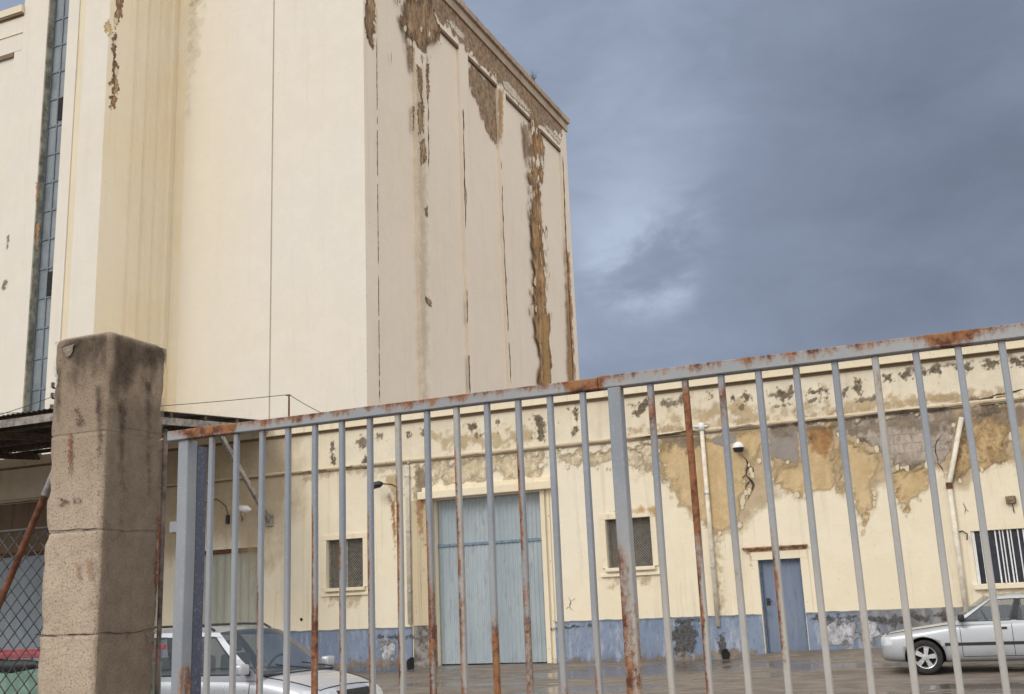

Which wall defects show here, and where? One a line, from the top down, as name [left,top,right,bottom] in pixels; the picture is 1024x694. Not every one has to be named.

spalling [104,0,124,110]
spalling [364,0,378,51]
peeling [397,0,441,166]
peeling [468,66,503,143]
spalling [523,117,553,384]
water stain [66,334,178,694]
water stain [205,441,285,551]
peeling [412,443,612,501]
crack [742,458,755,498]
peeling [627,396,1012,536]
peeling [827,614,884,649]